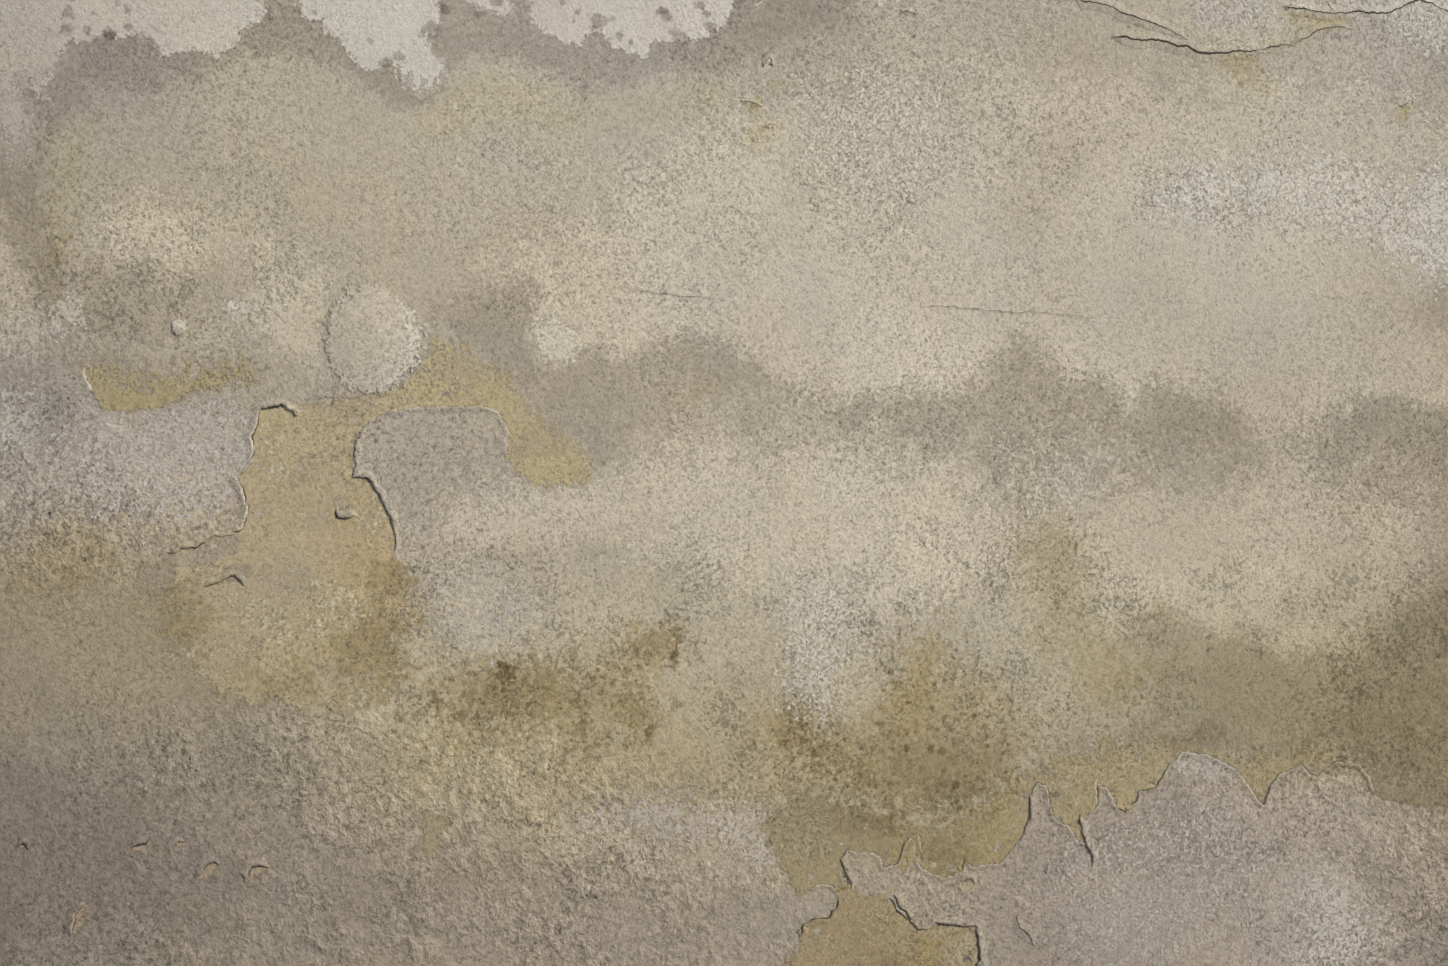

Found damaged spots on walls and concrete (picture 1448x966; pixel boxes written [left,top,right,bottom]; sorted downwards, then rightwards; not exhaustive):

crack [901,5,915,17]
crack [1058,0,1448,62]
leakage [757,34,1002,265]
efflorescence [42,285,92,347]
efflorescence [531,306,586,371]
peeling [63,332,596,728]
leakage [966,408,1136,552]
leakage [408,529,564,685]
efflorescence [756,541,882,736]
efflorescence [558,775,783,886]
peeling [752,715,1448,966]